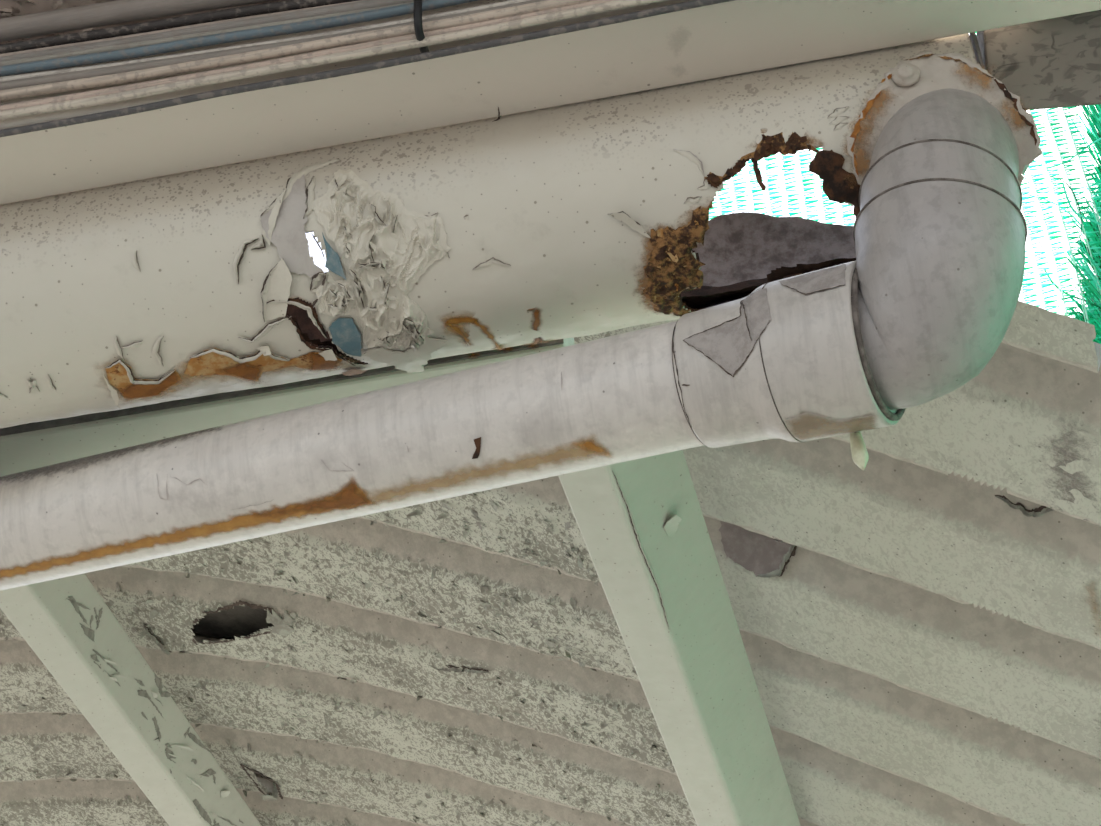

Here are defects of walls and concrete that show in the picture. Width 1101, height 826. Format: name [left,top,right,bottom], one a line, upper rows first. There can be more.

corrosion [846,74,892,177]
corrosion [906,54,1037,146]
corrosion [637,132,822,317]
peeling [311,169,452,373]
peeling [779,264,846,296]
corrosion [103,346,366,409]
corrosion [445,316,511,358]
peeling [683,288,771,377]
corrosion [0,440,609,579]
peeling [719,521,797,578]
crack [995,495,1054,517]
peeling [65,596,243,826]